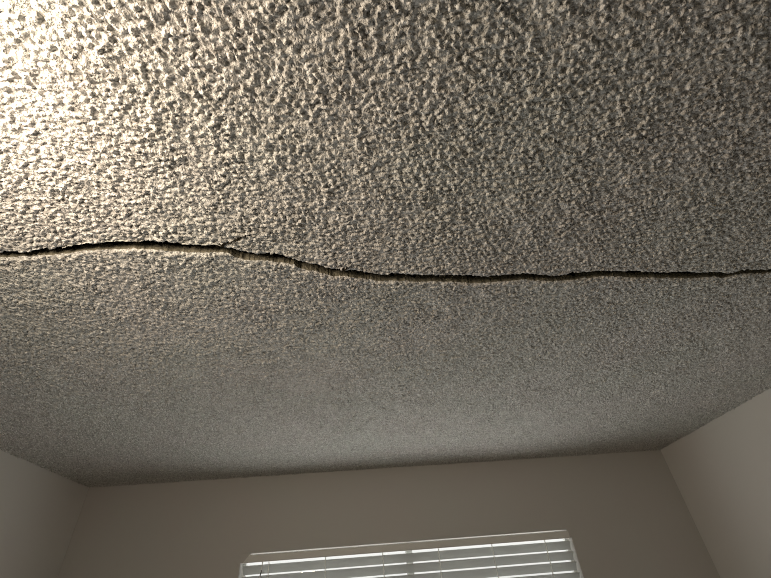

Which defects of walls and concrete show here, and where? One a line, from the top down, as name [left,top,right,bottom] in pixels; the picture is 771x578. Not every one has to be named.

crack [0,235,771,283]